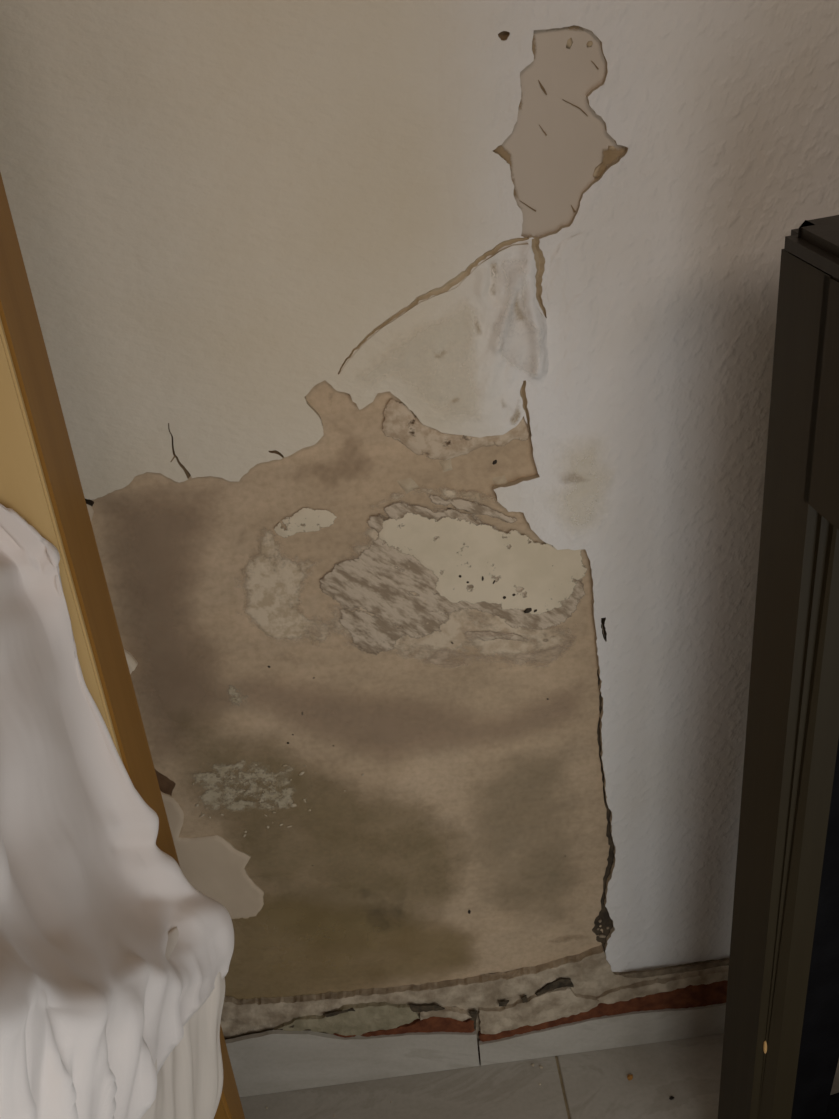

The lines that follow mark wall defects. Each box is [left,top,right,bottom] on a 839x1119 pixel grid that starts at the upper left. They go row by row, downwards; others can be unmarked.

flaking render [493,25,626,237]
crack [168,423,191,478]
flaking render [86,380,729,1058]
leakage [192,757,465,1000]